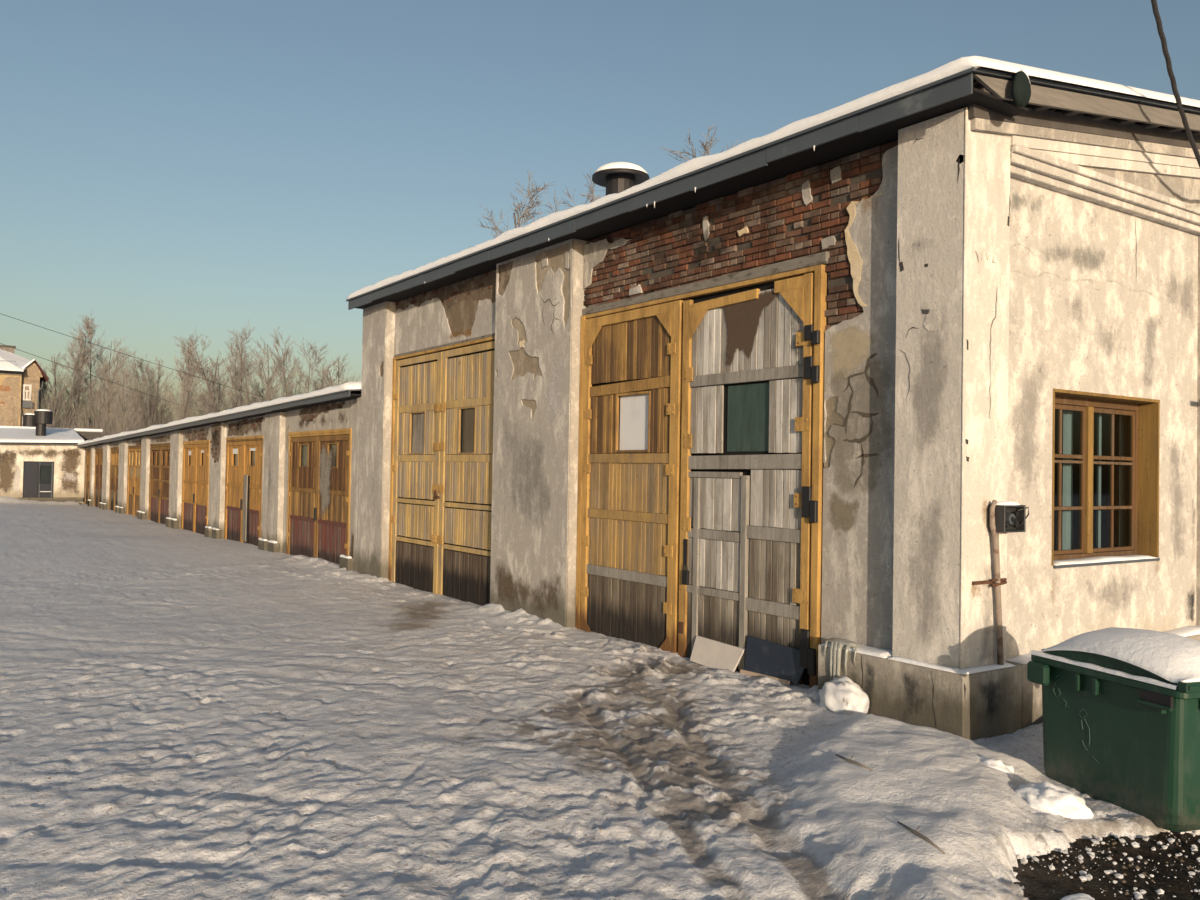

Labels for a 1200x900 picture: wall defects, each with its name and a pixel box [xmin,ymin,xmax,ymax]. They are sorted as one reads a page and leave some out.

flaking render [536,140,898,377]
flaking render [395,261,513,337]
flaking render [509,318,543,380]
flaking render [522,399,537,418]
crack [843,327,915,488]
leakage [0,449,81,492]